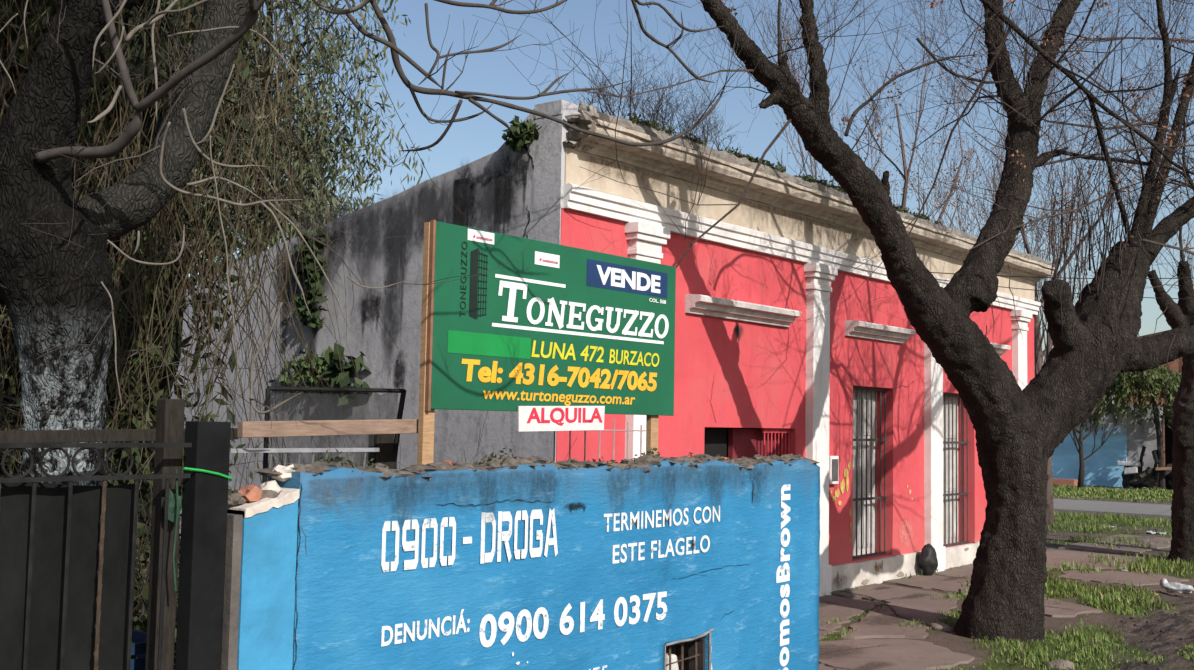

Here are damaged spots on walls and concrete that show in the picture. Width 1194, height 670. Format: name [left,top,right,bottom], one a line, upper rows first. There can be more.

damp [279,251,304,345]
damp [320,150,529,387]